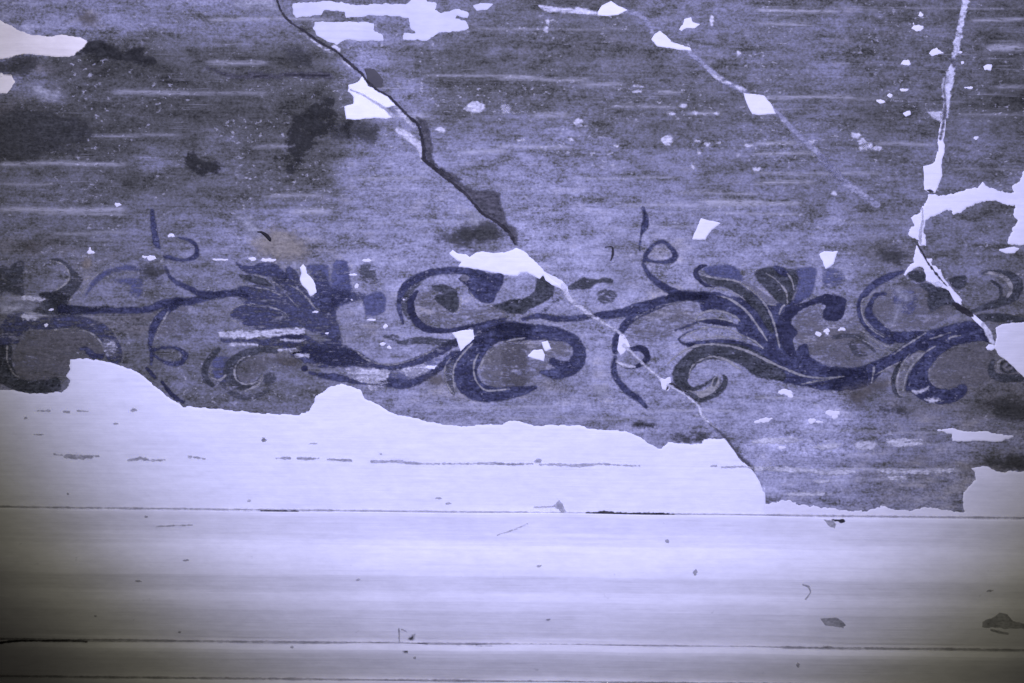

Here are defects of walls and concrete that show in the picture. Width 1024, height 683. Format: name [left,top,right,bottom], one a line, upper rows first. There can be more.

peeling [0,20,88,59]
peeling [292,0,493,45]
damp [0,108,91,160]
damp [185,152,220,176]
damp [285,97,379,174]
crack [207,0,518,244]
peeling [344,77,396,120]
crack [923,0,970,193]
peeling [450,248,560,286]
crack [904,244,995,344]
crack [544,272,754,471]
peeling [0,341,1024,520]